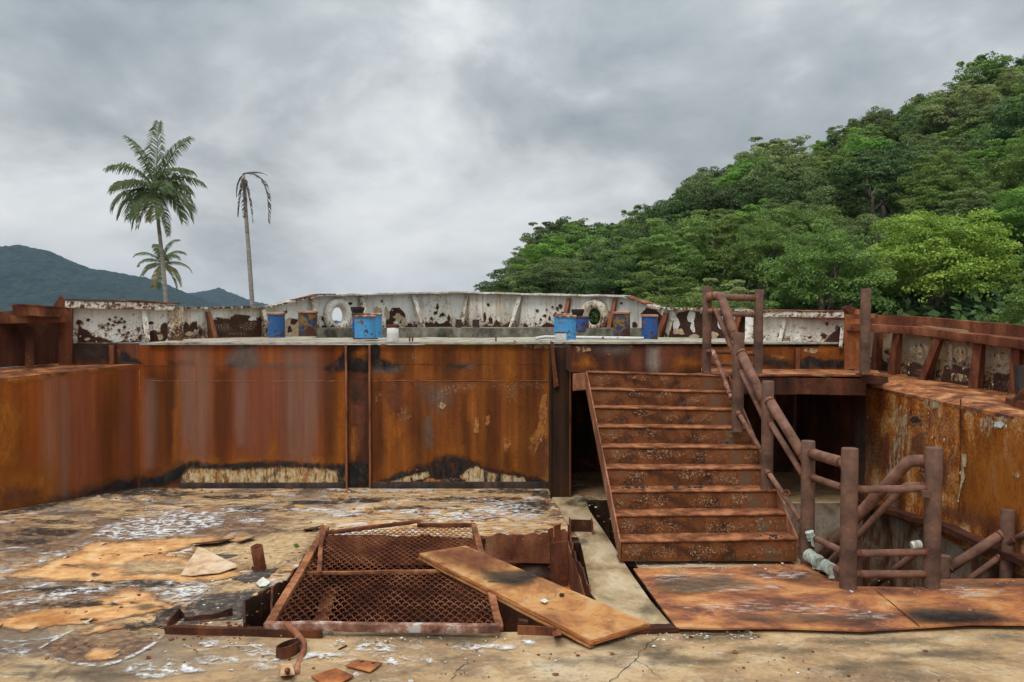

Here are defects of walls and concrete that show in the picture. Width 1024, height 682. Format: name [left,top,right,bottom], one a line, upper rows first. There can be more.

peeling [76,316,168,343]
peeling [183,314,262,338]
peeling [284,310,299,336]
peeling [374,300,453,327]
peeling [482,303,511,327]
peeling [523,304,563,327]
peeling [905,345,972,386]
peeling [992,353,1010,393]
corrosion [174,377,367,465]
corrosion [908,414,924,455]
corrosion [942,440,1024,533]
damp [1,488,550,562]